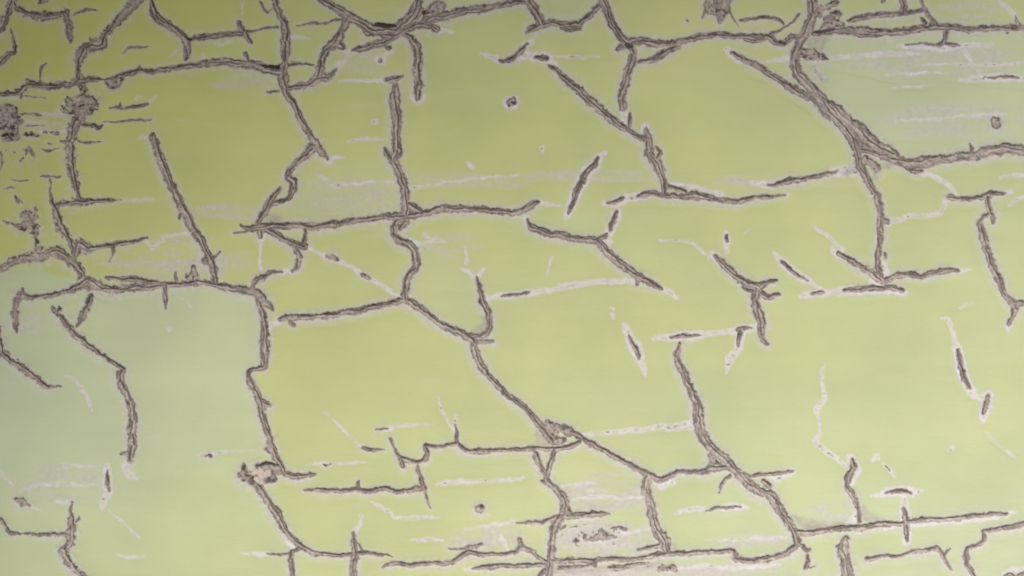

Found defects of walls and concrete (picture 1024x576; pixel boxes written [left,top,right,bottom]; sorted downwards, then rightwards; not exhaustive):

crack [0,0,1024,336]
crack [0,236,1024,576]